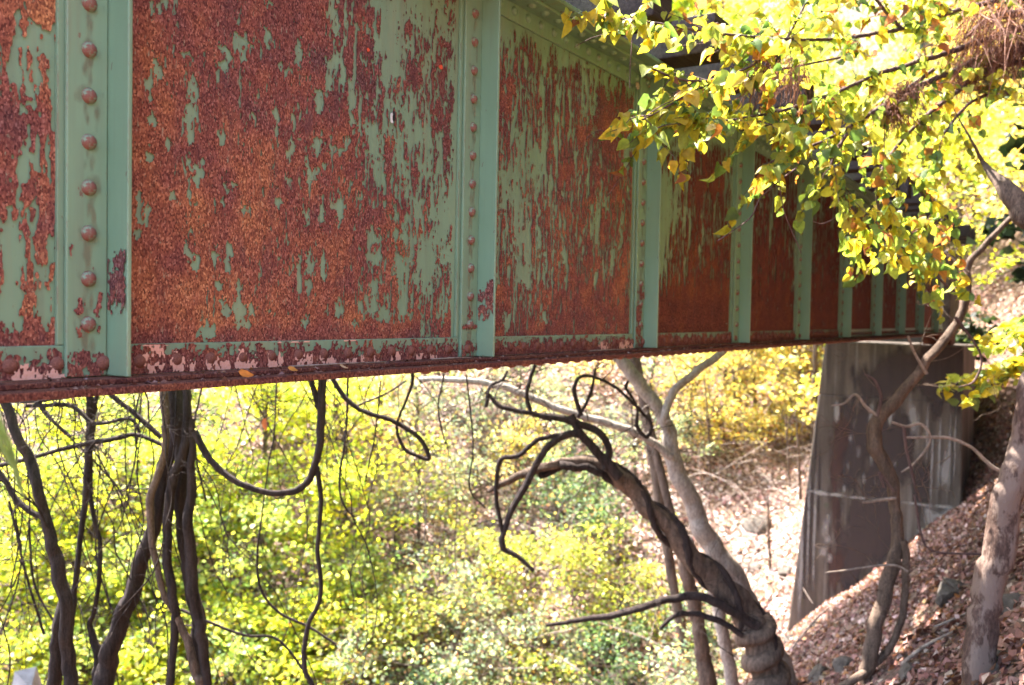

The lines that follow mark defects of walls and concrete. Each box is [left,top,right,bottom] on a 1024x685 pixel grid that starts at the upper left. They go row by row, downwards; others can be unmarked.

peeling [11,364,67,381]
peeling [143,341,402,374]
rust [0,0,645,381]
rust [658,132,733,347]
rust [750,152,798,342]
rust [809,184,841,339]
rust [851,244,933,329]